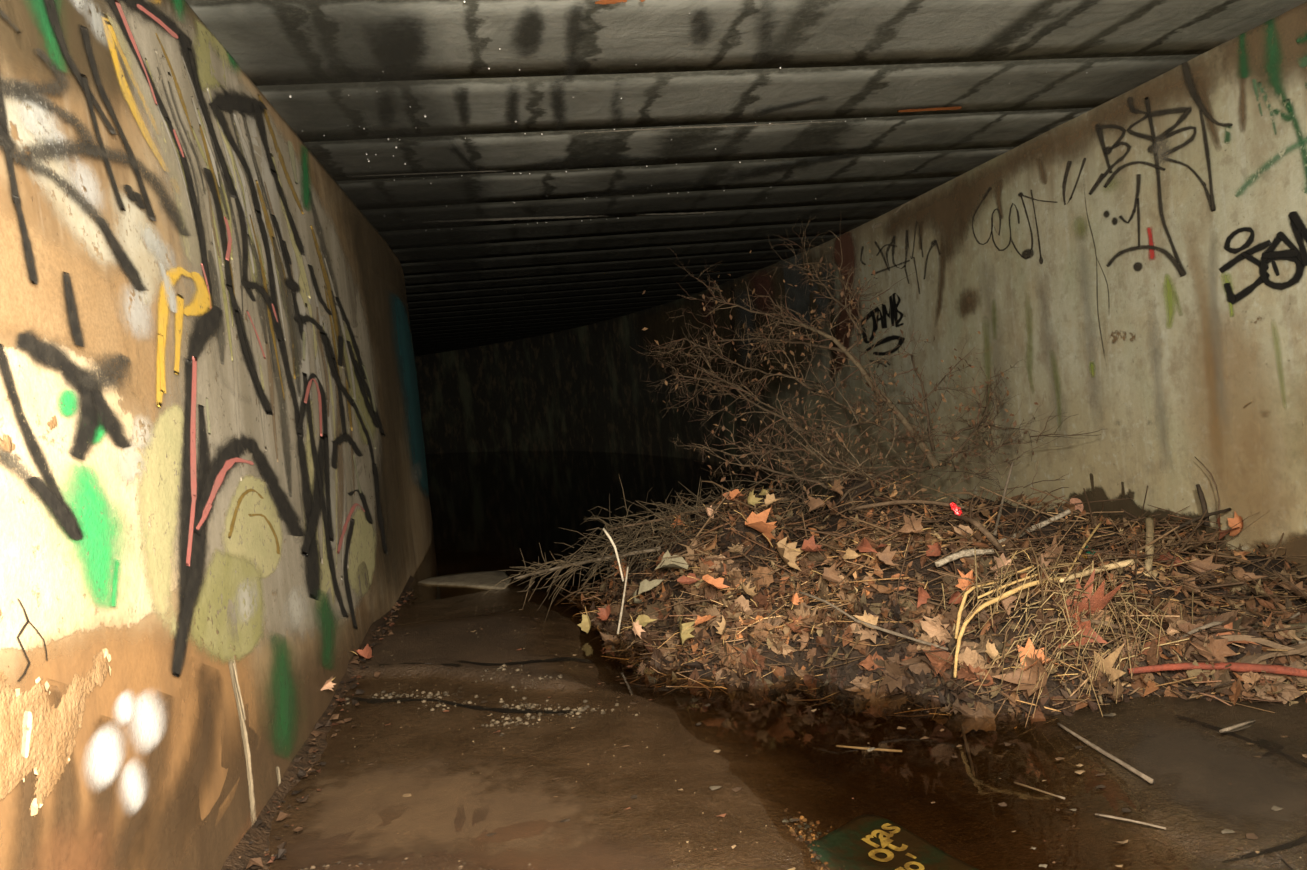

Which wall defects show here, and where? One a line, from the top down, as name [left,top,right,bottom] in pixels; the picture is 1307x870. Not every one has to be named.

peeling [0,411,15,462]
peeling [0,647,112,817]